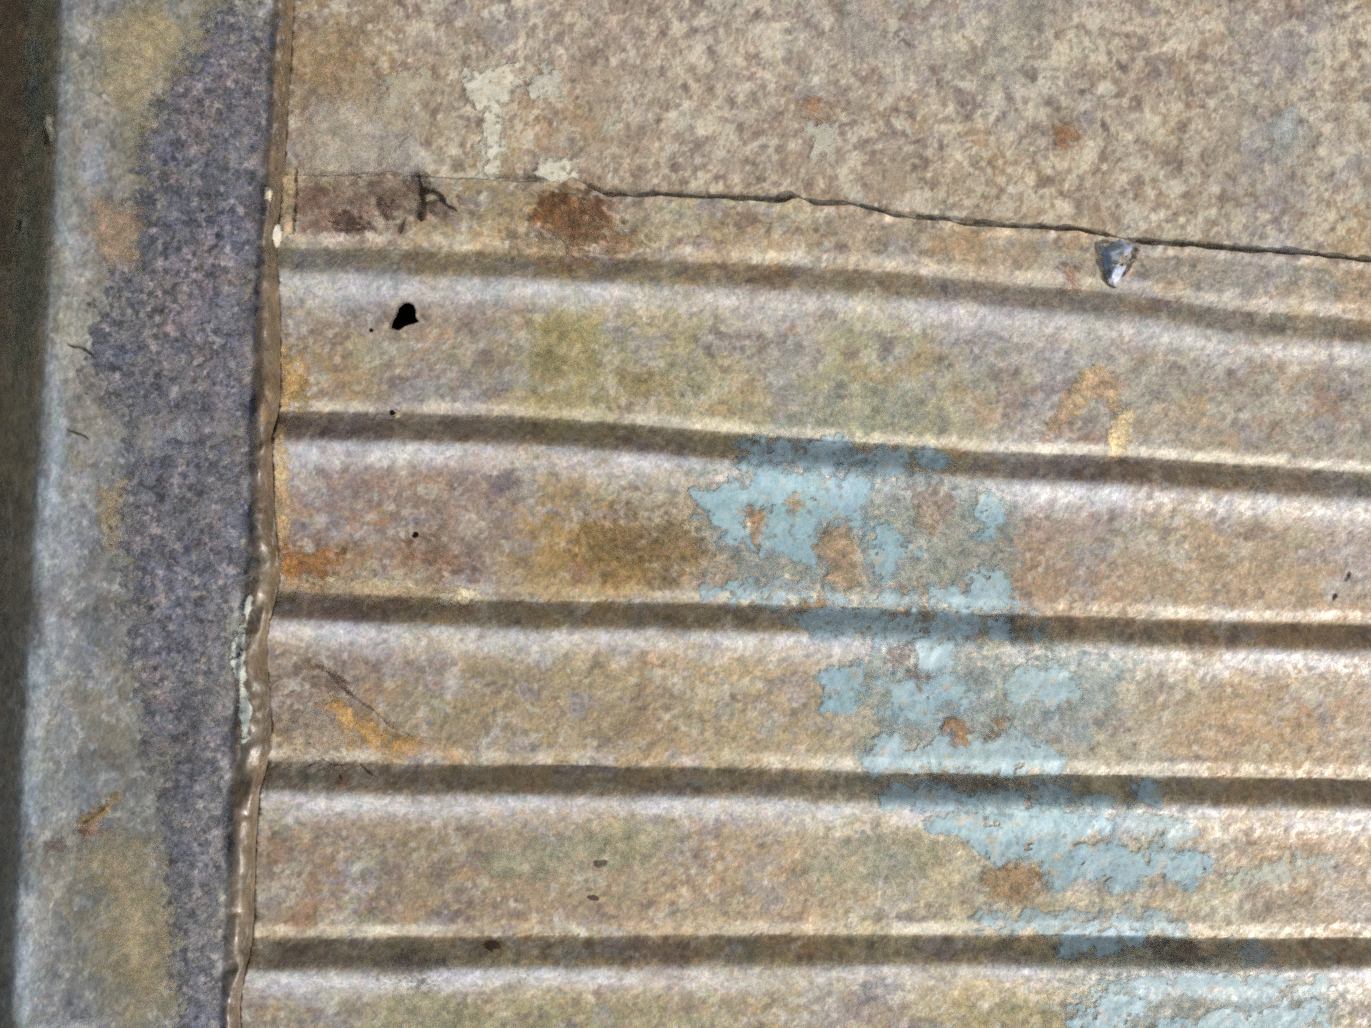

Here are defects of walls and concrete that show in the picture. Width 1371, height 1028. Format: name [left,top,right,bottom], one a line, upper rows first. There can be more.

crack [292,167,458,235]
crack [496,175,548,183]
corrosion [508,183,643,257]
crack [587,185,794,202]
crack [859,204,1370,262]
corrosion [577,509,704,591]
peeling [689,433,1345,1028]